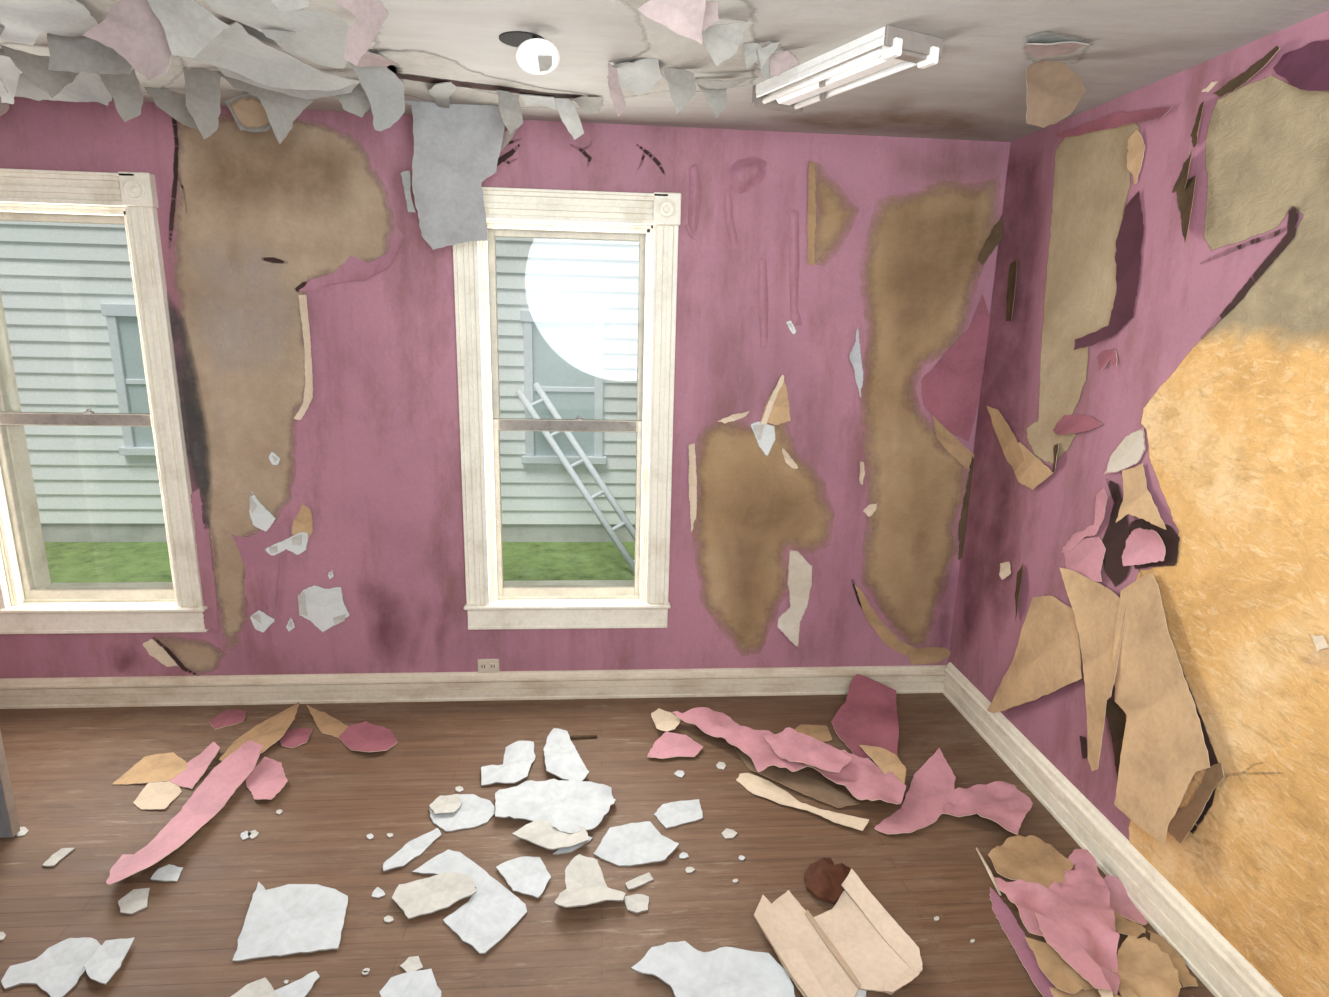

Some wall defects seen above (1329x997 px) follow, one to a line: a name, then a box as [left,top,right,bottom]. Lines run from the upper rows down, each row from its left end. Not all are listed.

peeling [1024,31,1093,128]
peeling [0,0,799,250]
spalling [268,452,280,466]
spalling [751,421,775,456]
spalling [249,491,308,556]
spalling [250,570,350,633]
spalling [1311,635,1329,652]